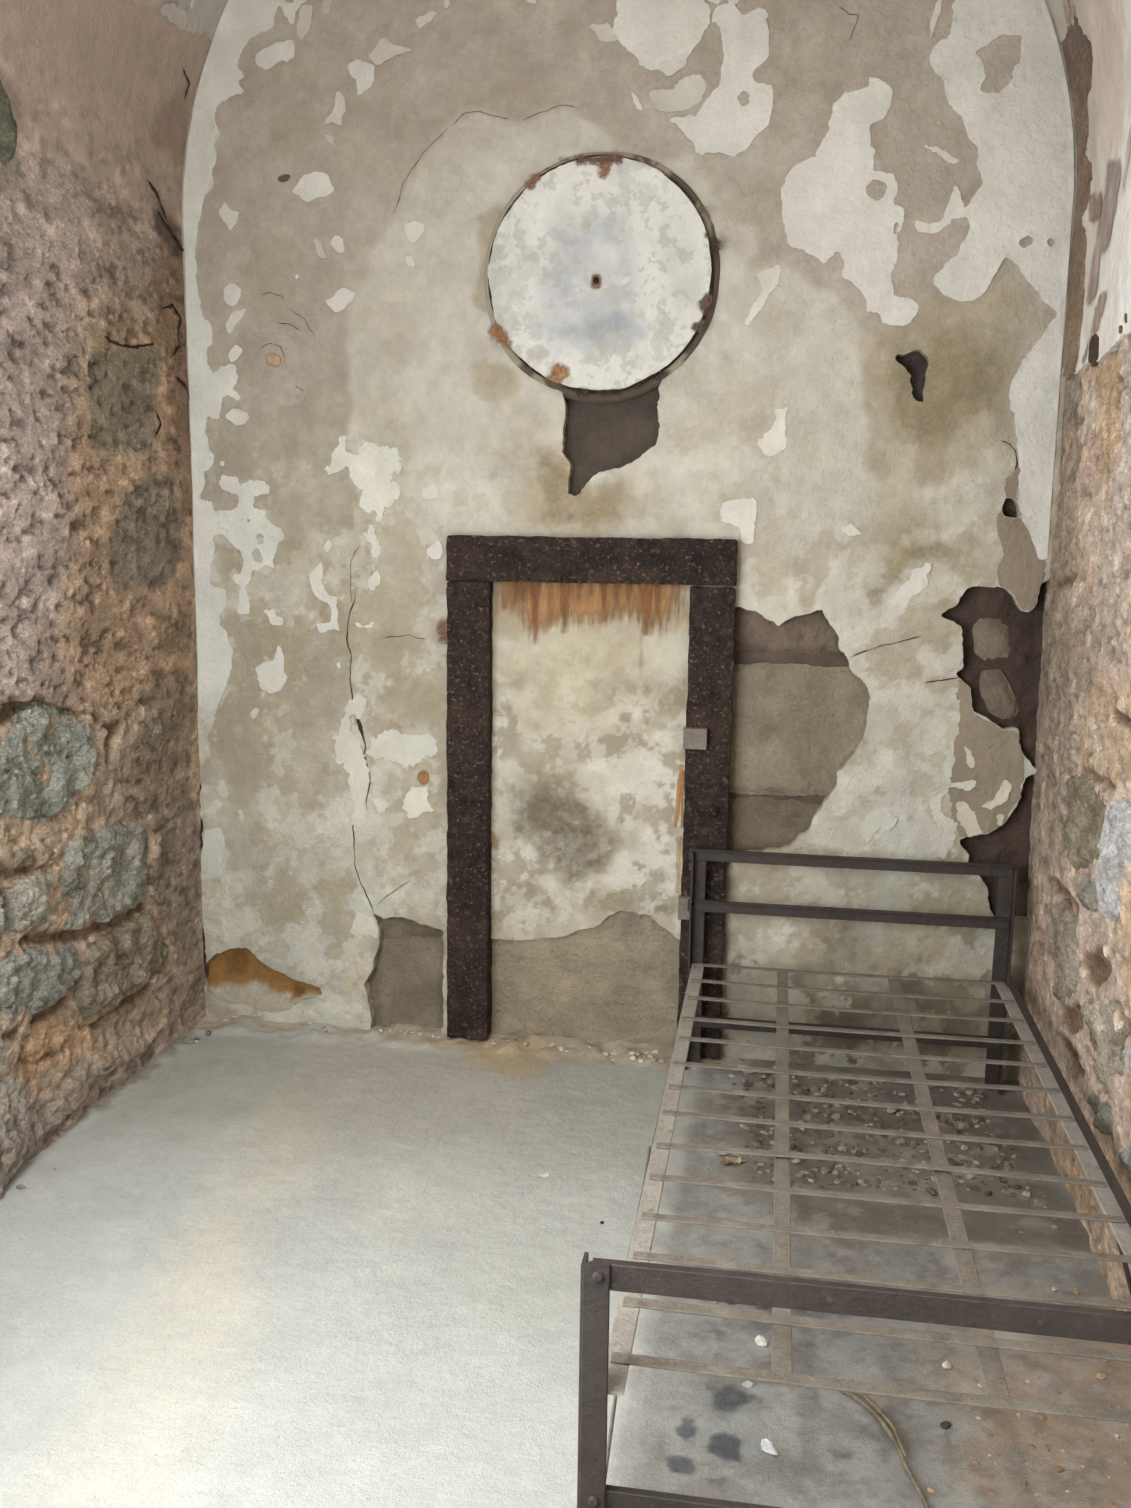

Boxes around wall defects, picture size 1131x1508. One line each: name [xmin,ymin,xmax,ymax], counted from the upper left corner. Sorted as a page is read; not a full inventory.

peeling [590,0,773,157]
peeling [160,0,334,712]
peeling [325,436,403,590]
crack [346,546,409,910]
rust [499,581,680,635]
rust [488,154,721,397]
spalling [564,385,660,496]
spalling [727,607,870,851]
spalling [781,0,1131,1205]
spalling [0,686,179,1197]
spalling [350,913,444,1029]
spalling [490,911,680,1049]